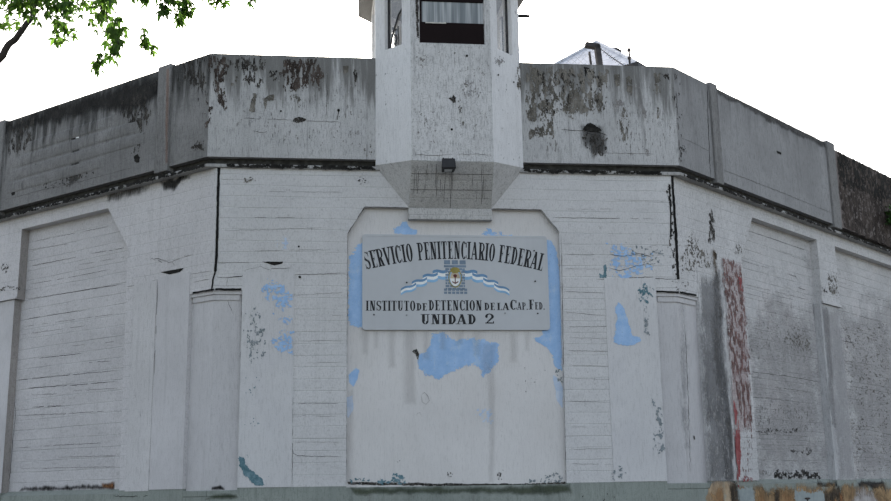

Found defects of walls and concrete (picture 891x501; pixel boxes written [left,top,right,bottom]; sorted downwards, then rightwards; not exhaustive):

water stain [6,78,158,156]
water stain [0,164,205,220]
water stain [581,126,608,156]
peeling [517,63,682,159]
crack [493,94,831,380]
water stain [684,151,891,253]
crack [9,168,407,484]
peeling [412,332,499,380]
crack [683,325,691,461]
peeling [599,186,825,501]
water stain [701,251,733,481]
peeling [238,456,269,486]